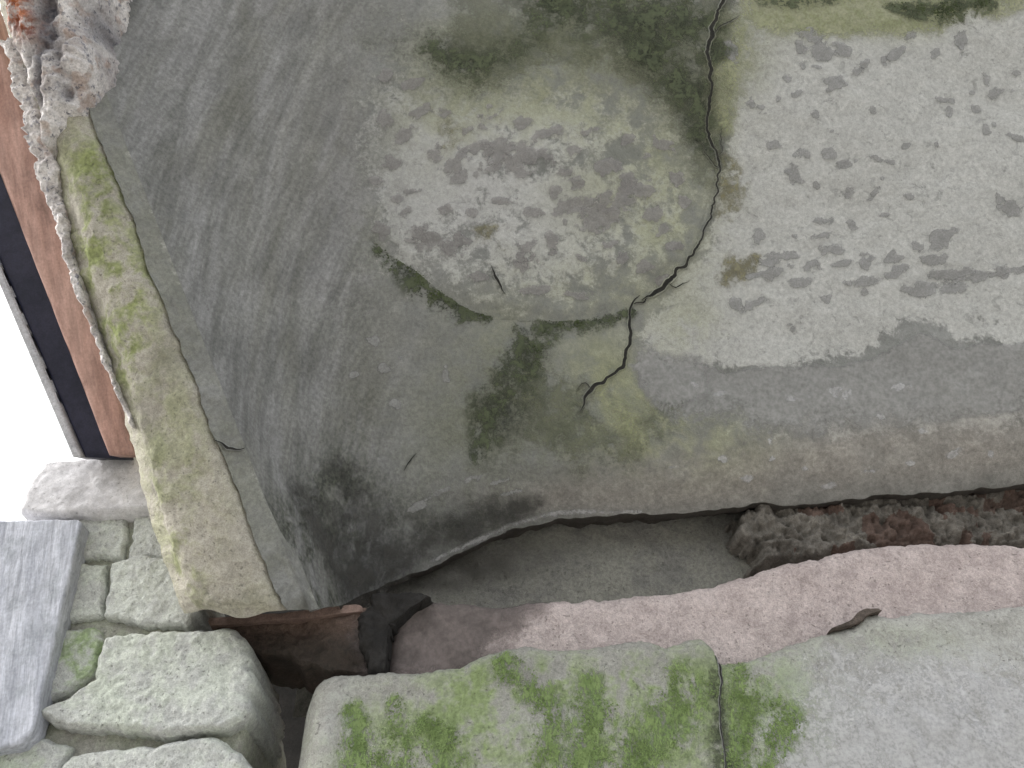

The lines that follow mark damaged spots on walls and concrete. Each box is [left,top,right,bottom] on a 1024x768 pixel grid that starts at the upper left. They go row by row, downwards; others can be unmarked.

spalling [4,0,132,158]
crack [576,0,739,413]
flaking render [724,487,1024,579]
crack [715,655,727,768]